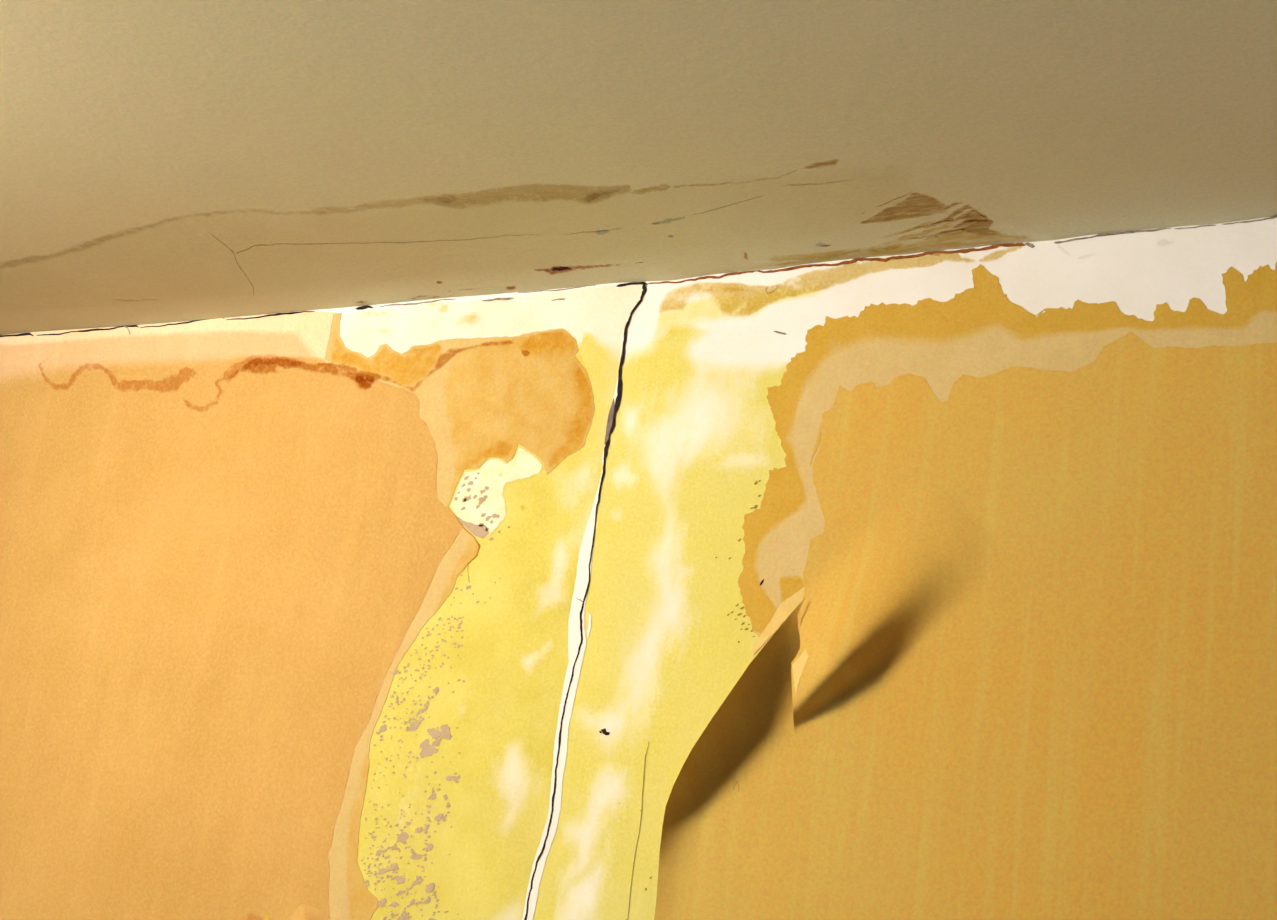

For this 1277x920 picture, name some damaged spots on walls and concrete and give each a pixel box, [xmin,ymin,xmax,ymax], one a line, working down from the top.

crack [0,311,315,337]
damp [626,742,652,920]
spalling [340,217,1277,920]
crack [355,215,1277,920]